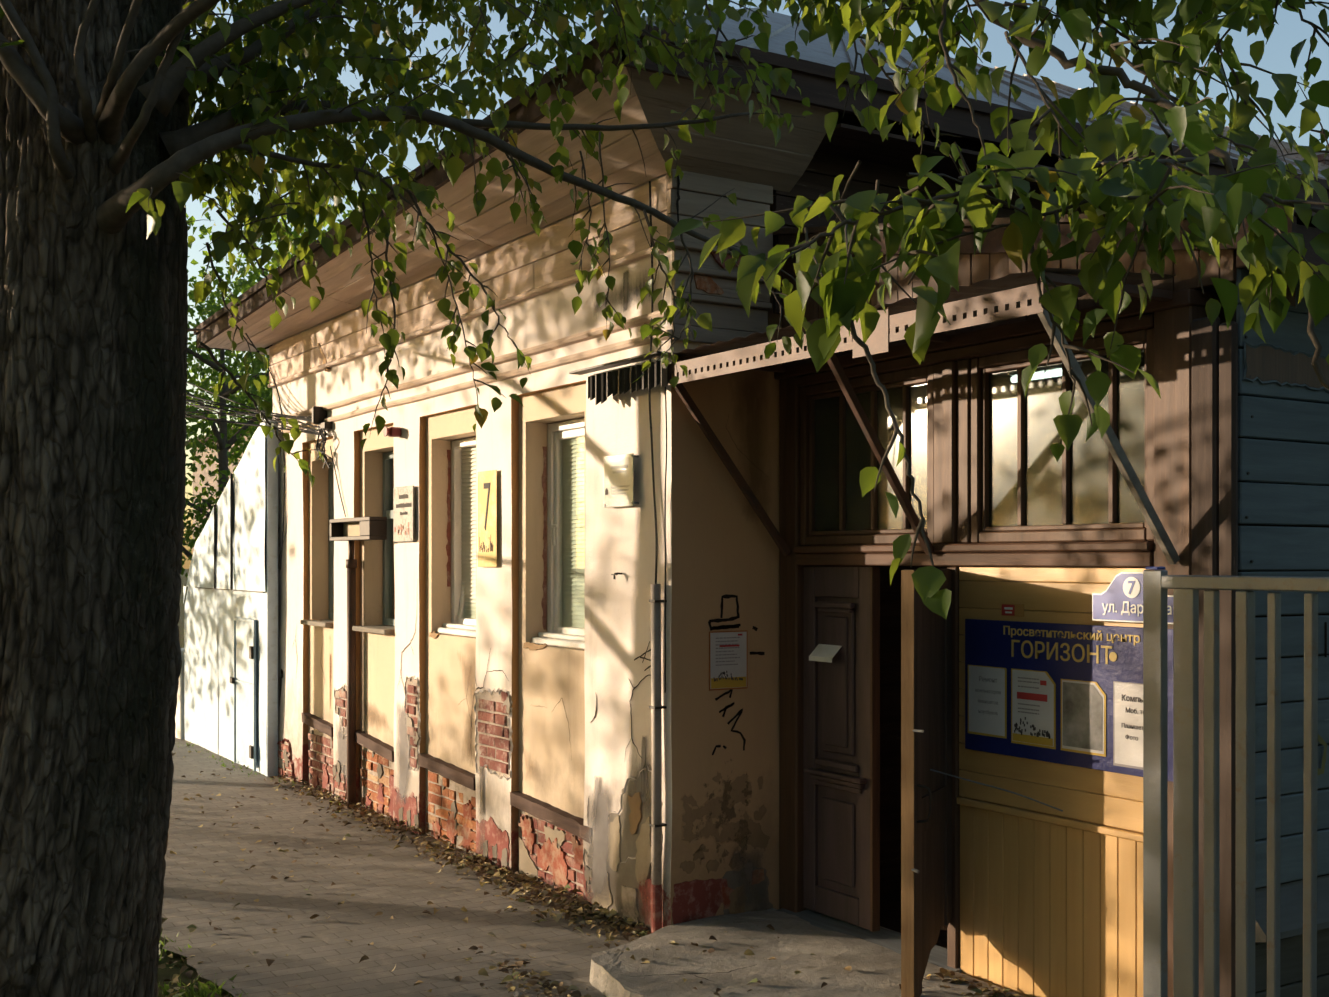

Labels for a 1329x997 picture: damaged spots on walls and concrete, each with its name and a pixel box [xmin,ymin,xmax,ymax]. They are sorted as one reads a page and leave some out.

flaking render [277,675,663,934]
peeling [671,879,734,924]